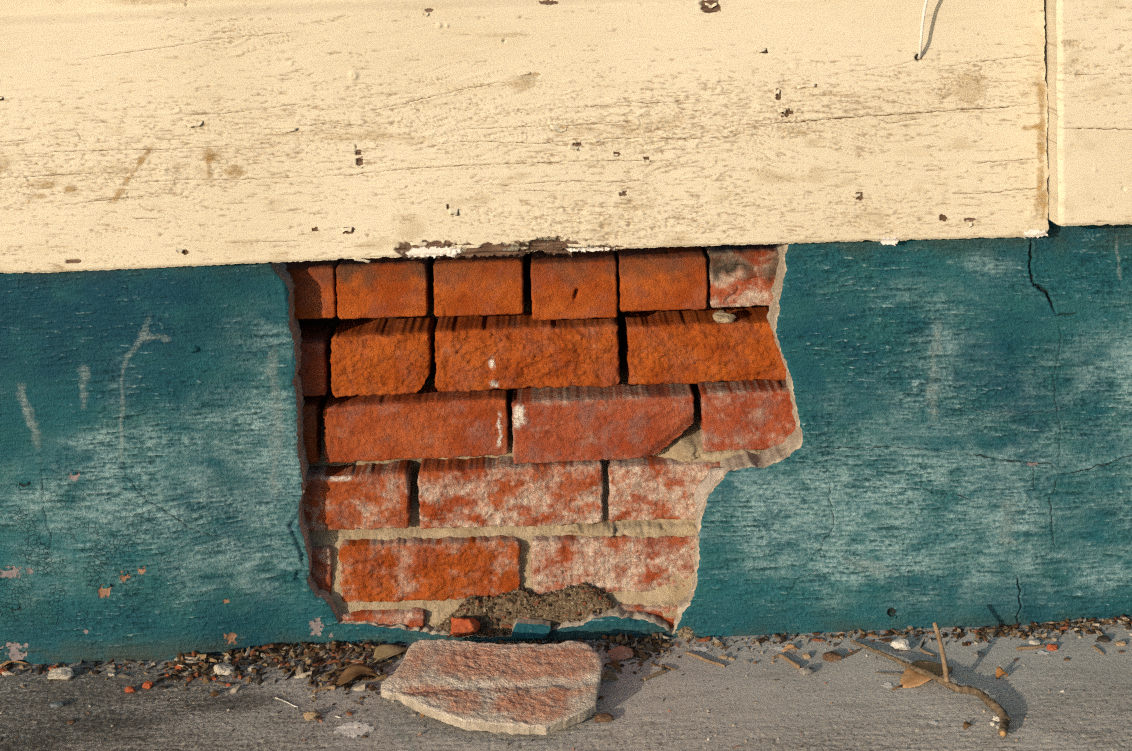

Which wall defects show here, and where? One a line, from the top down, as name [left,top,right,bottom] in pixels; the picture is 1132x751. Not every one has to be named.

flaking render [271,262,511,639]
peeling [394,236,623,260]
flaking render [550,243,803,635]
crack [816,244,1132,622]